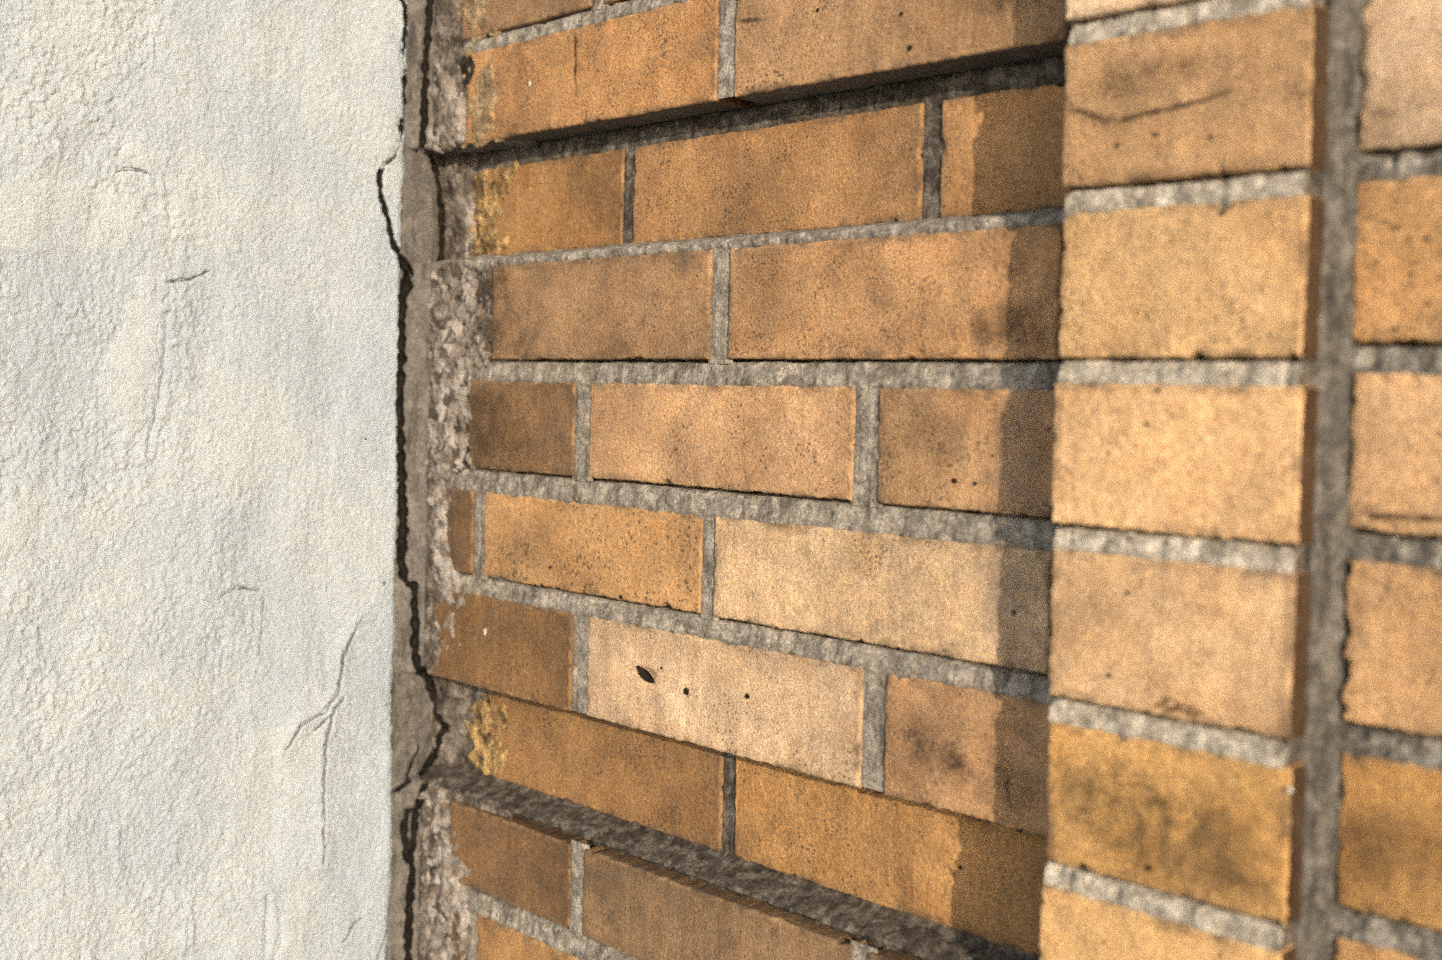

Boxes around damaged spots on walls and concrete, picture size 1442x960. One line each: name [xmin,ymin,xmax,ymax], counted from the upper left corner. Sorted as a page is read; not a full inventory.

crack [286,617,363,863]
crack [341,0,450,960]